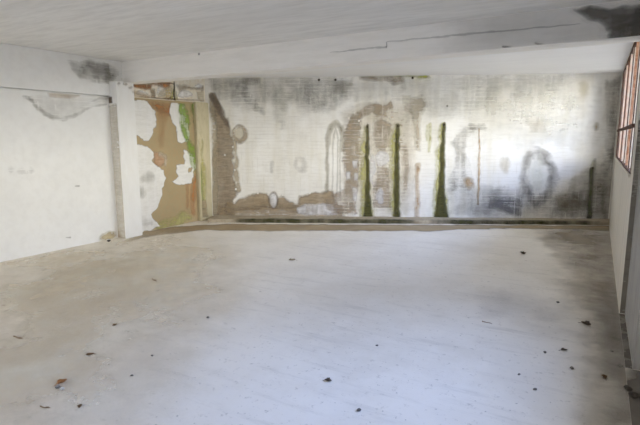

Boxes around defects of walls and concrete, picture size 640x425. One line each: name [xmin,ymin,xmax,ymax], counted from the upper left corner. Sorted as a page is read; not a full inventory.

leakage [579,6,640,38]
peeling [134,100,196,232]
peeling [209,93,392,216]
leakage [560,169,608,211]